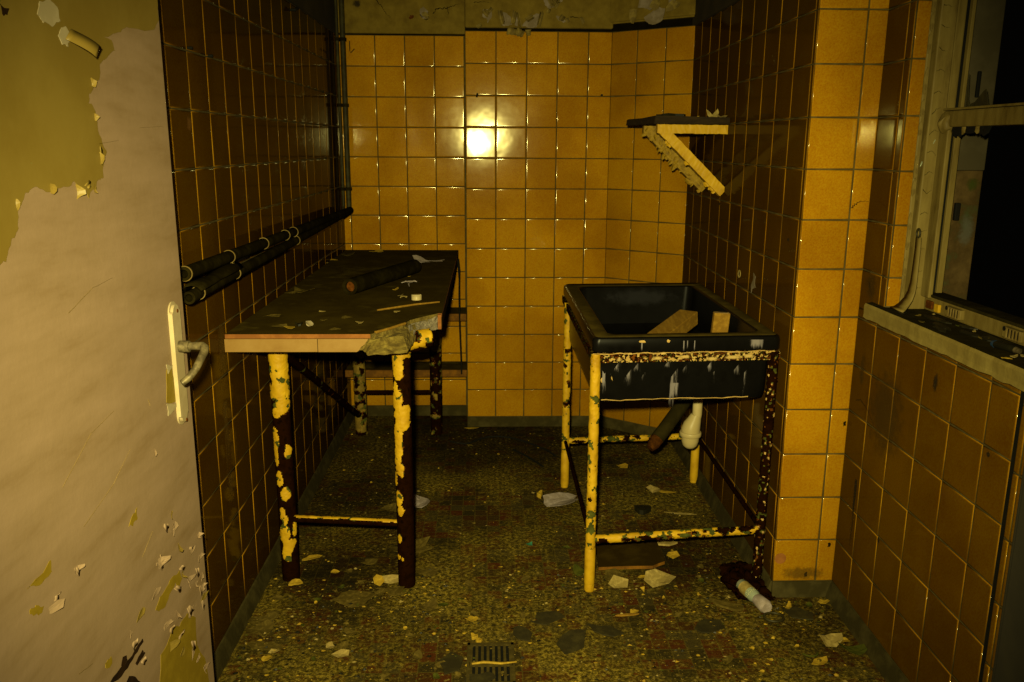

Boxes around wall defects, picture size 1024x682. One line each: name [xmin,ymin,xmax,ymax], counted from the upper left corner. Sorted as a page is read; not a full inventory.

peeling [474,0,585,37]
peeling [629,0,681,25]
peeling [0,0,159,264]
peeling [27,560,52,589]
peeling [156,570,182,611]
spalling [105,639,145,682]
peeling [160,613,209,682]